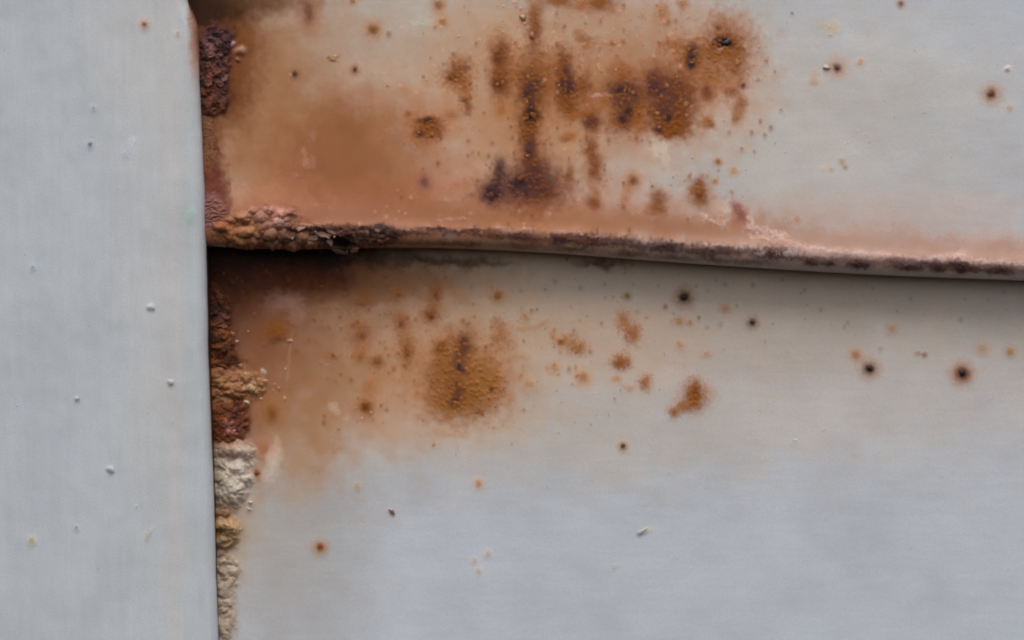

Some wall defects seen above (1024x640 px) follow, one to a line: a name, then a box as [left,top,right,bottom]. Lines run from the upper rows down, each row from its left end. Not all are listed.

corrosion [547,0,624,9]
corrosion [191,11,251,235]
corrosion [254,4,1024,274]
corrosion [210,285,249,370]
corrosion [424,335,508,421]
corrosion [670,379,707,415]
corrosion [852,352,875,373]
corrosion [955,365,970,380]
corrosion [213,399,251,444]